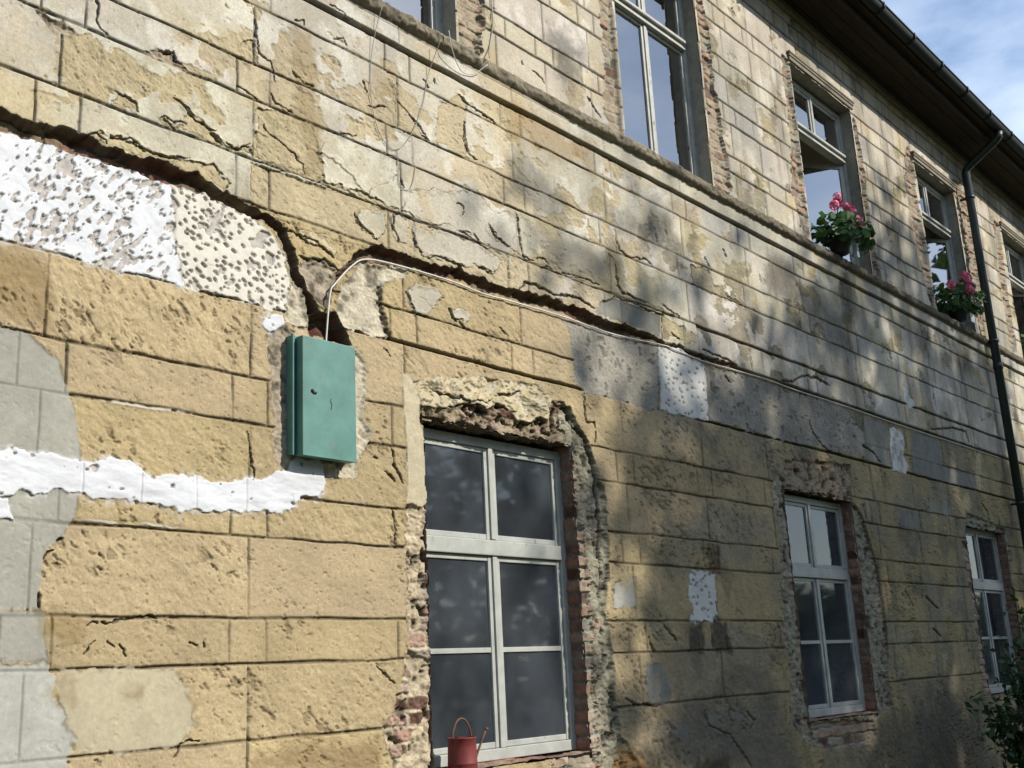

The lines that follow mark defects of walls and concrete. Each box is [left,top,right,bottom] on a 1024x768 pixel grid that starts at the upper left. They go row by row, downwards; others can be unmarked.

crack [95,0,104,31]
crack [81,131,186,160]
crack [161,19,315,175]
crack [460,97,496,135]
crack [286,229,339,271]
peeling [90,90,587,479]
crack [354,202,734,383]
crack [83,613,158,657]
flaking render [382,373,633,768]
flaking render [772,458,894,749]
flaking render [961,540,992,697]
flaking render [965,511,1015,588]